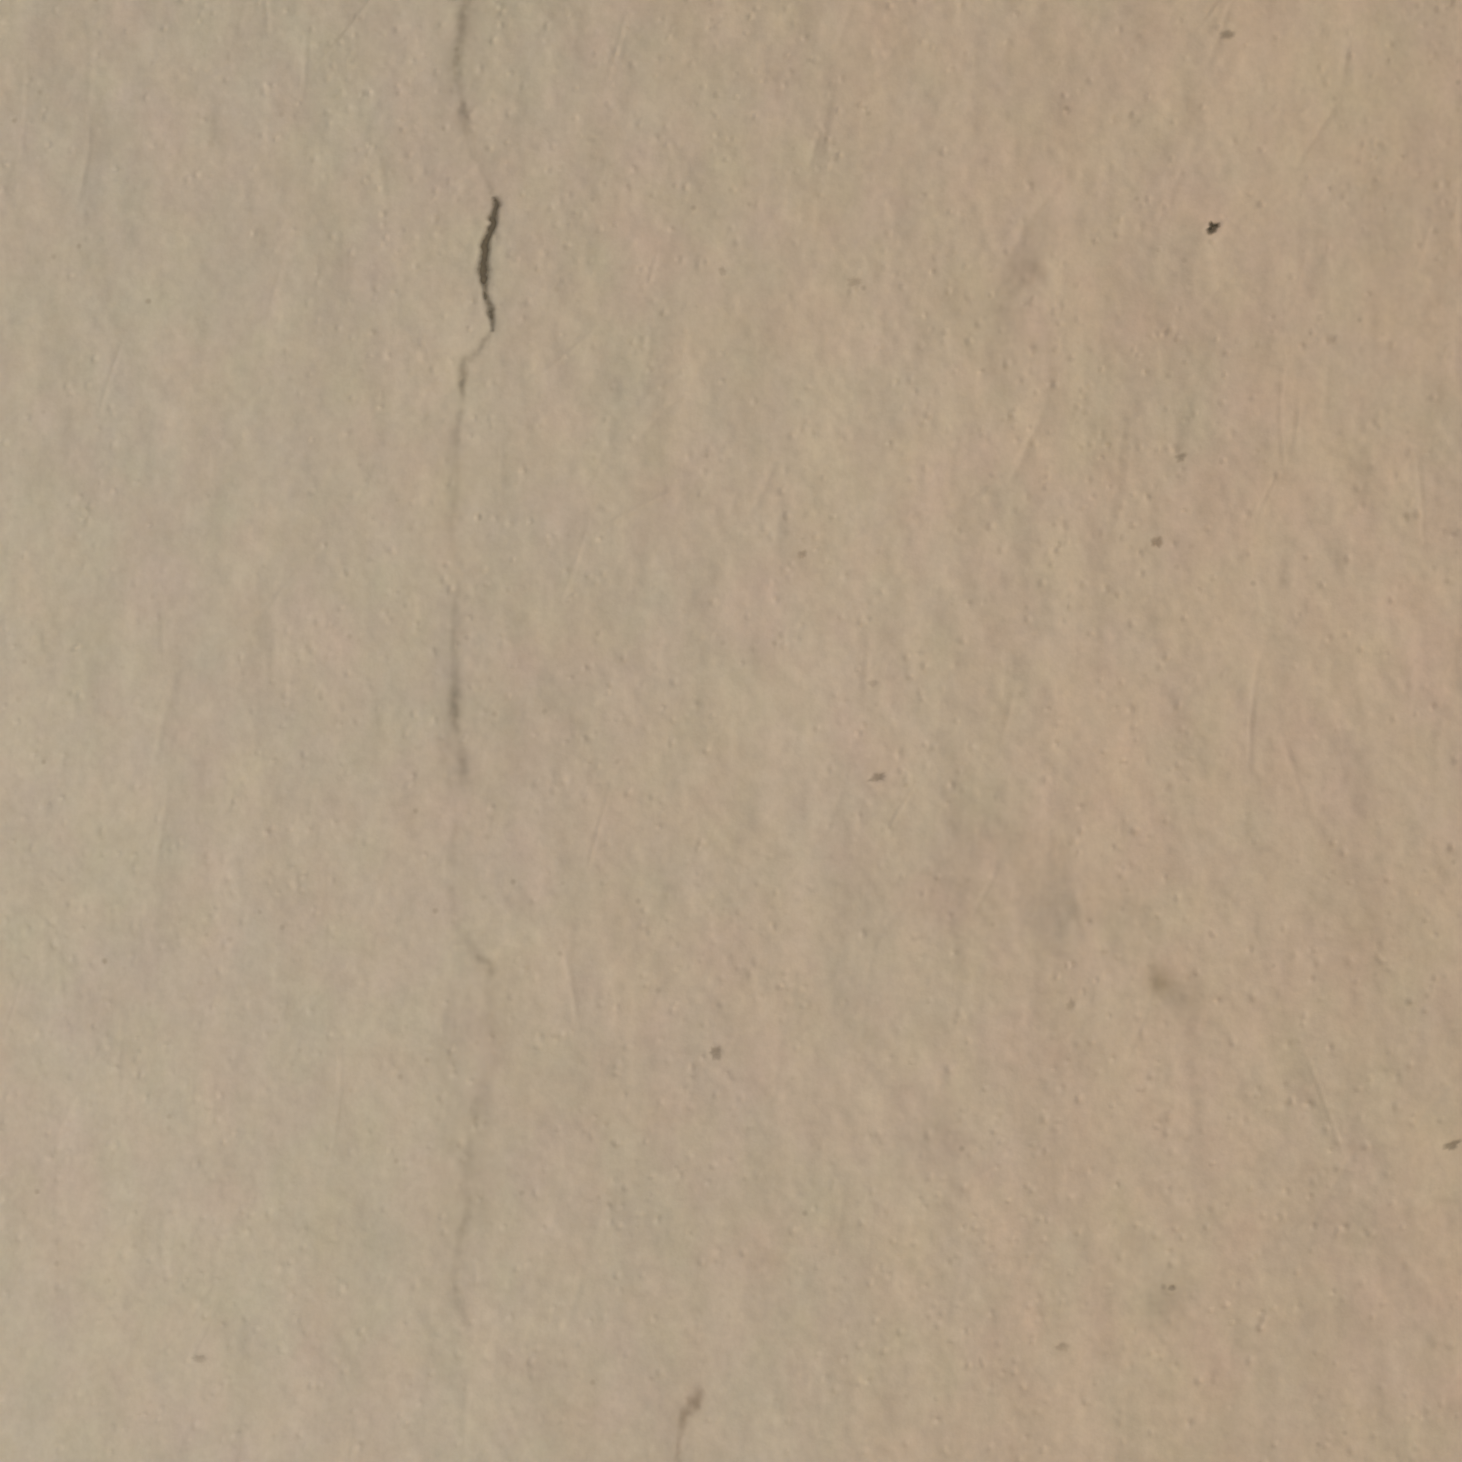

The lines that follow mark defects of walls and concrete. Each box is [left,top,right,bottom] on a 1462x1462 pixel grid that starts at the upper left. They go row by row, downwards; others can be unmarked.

crack [479,197,499,320]